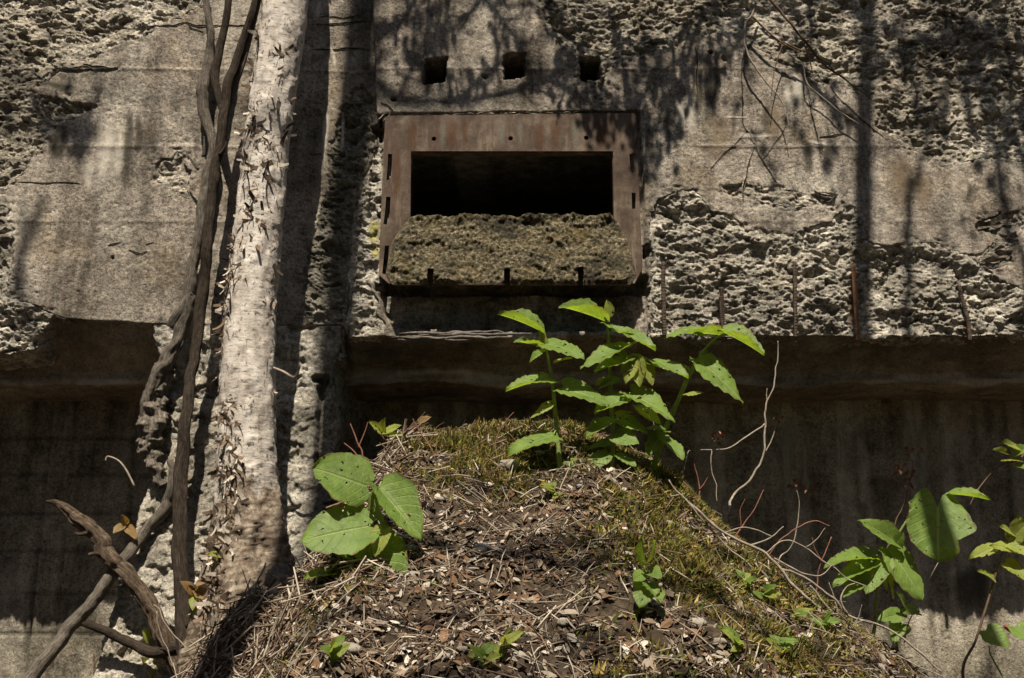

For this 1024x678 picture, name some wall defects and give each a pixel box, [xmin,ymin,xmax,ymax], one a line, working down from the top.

spalling [0,0,202,191]
crack [20,178,75,186]
spalling [0,206,74,371]
spalling [646,185,1024,348]